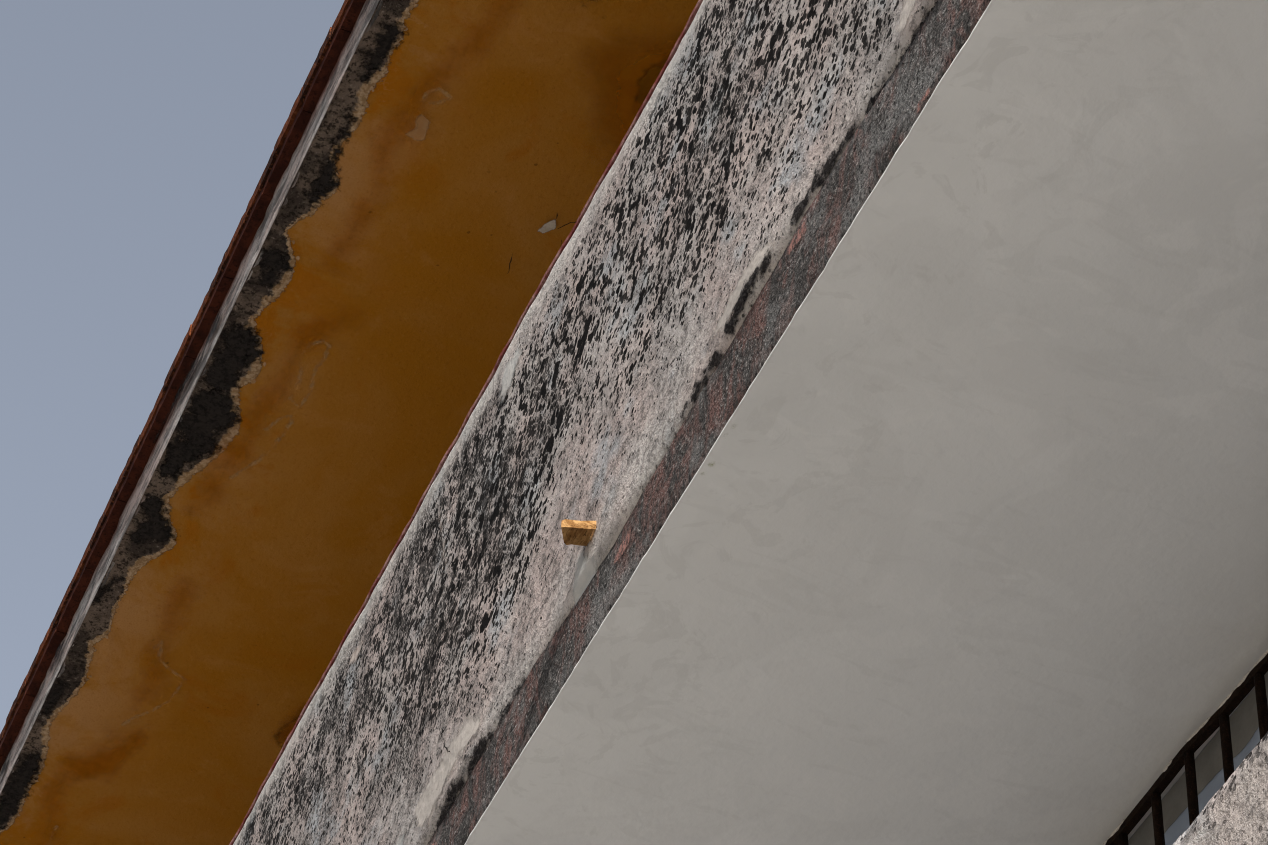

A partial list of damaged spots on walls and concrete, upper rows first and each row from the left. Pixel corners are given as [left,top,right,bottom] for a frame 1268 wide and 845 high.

peeling [896,0,916,32]
leakage [304,114,358,208]
leakage [603,42,676,147]
leakage [790,0,938,226]
leakage [722,250,770,337]
leakage [154,310,264,478]
peeling [0,0,419,833]
peeling [500,348,521,399]
leakage [680,351,722,419]
leakage [129,493,175,544]
peeling [415,714,481,827]
leakage [434,677,526,834]